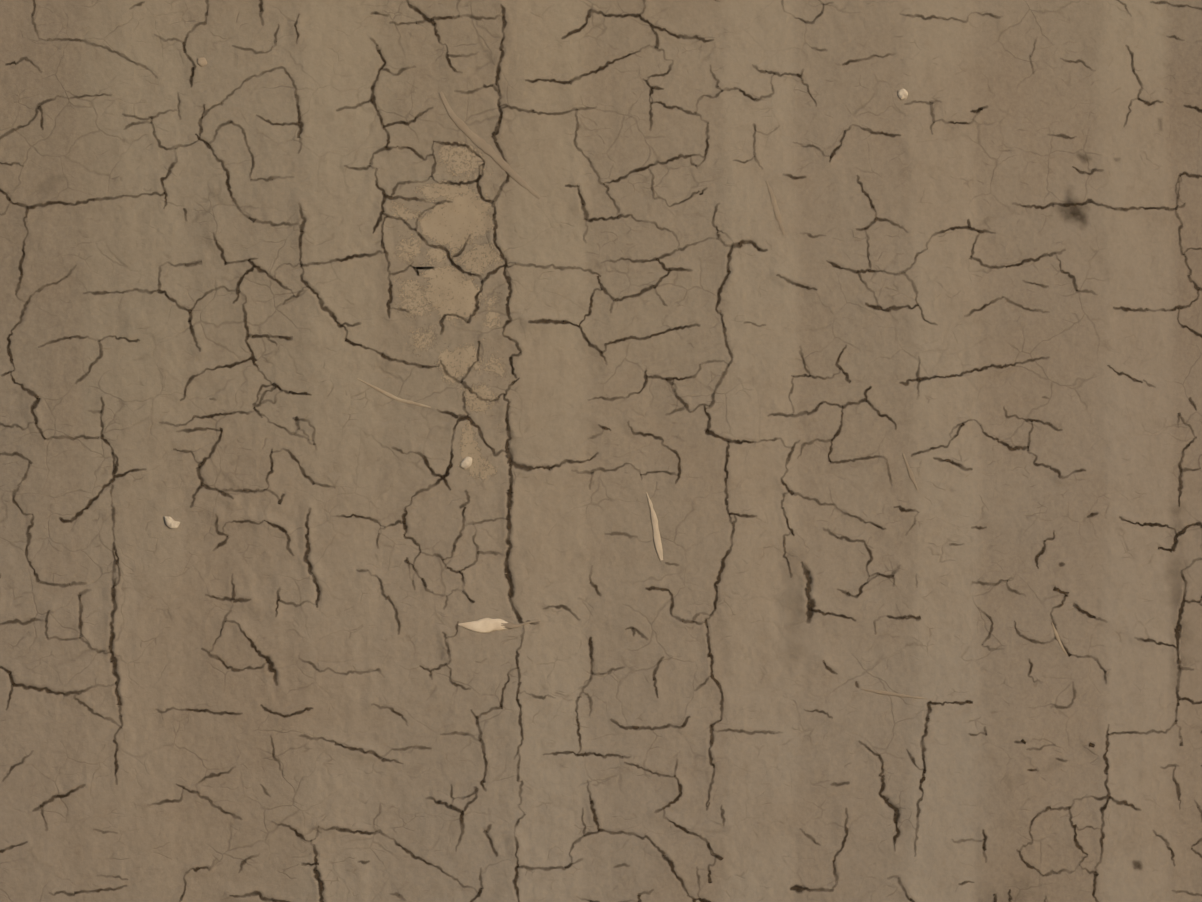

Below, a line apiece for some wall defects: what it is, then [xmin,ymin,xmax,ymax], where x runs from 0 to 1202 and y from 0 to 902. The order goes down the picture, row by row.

crack [1127,48,1202,117]
peeling [390,141,511,480]
crack [866,303,928,322]
crack [901,359,1035,386]
crack [941,220,1077,310]
crack [1022,135,1202,338]
crack [0,162,140,774]
crack [915,416,1085,478]
crack [987,533,1106,680]
crack [1088,439,1202,721]
crack [866,701,973,845]
crack [1009,730,1137,902]